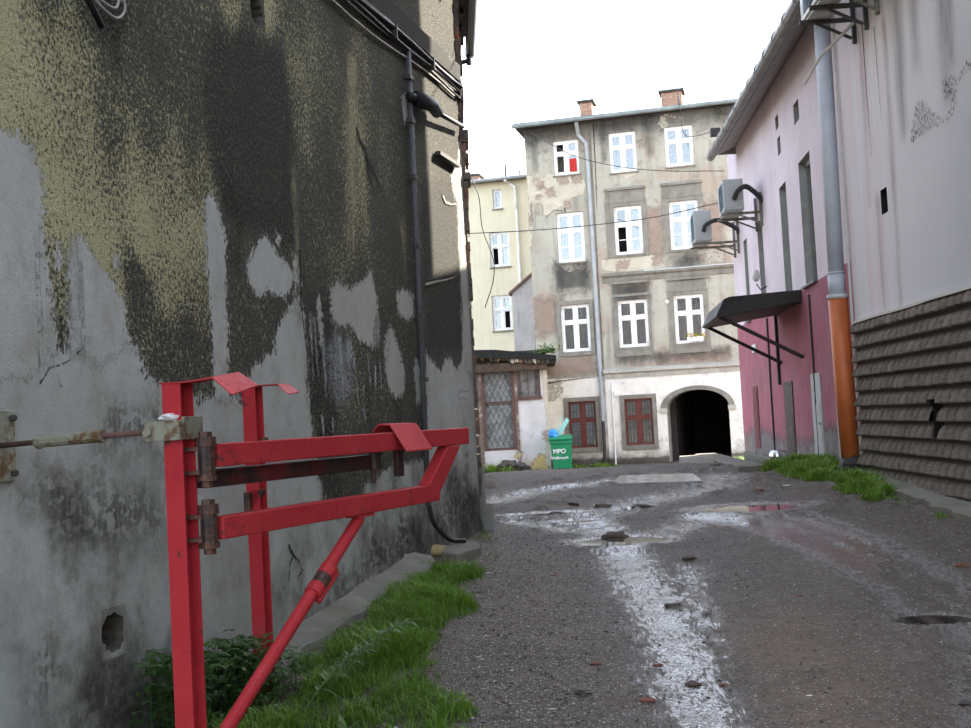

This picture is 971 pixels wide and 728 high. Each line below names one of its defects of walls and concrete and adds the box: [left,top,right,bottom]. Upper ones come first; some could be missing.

damp [348,56,357,204]
peeling [911,61,971,143]
peeling [0,126,132,389]
peeling [201,188,232,406]
peeling [245,229,301,318]
damp [309,314,355,398]
peeling [316,270,421,407]
peeling [527,173,587,248]